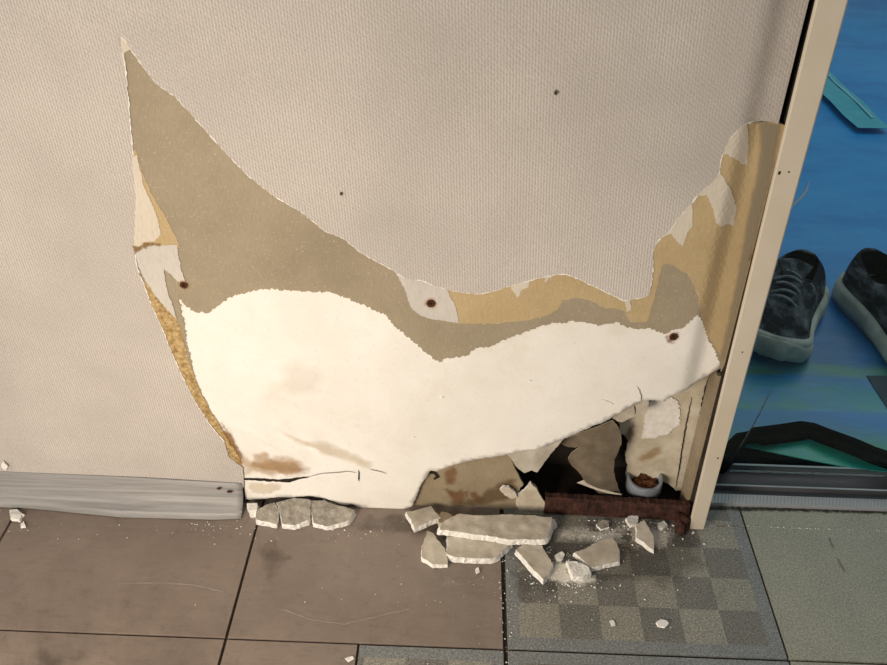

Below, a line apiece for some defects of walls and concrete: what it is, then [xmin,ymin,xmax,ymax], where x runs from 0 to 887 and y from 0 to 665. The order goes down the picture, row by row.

crack [244,469,387,506]
flaking render [120,37,785,509]